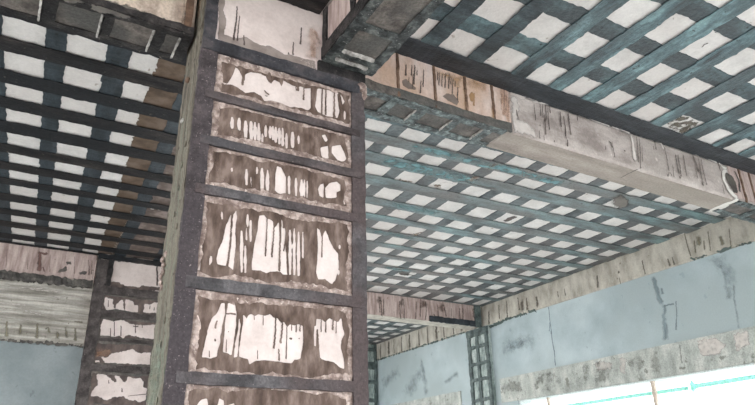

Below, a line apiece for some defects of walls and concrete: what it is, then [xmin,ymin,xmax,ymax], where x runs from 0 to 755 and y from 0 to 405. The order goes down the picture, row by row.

spalling [395,0,755,193]
spalling [365,114,729,307]